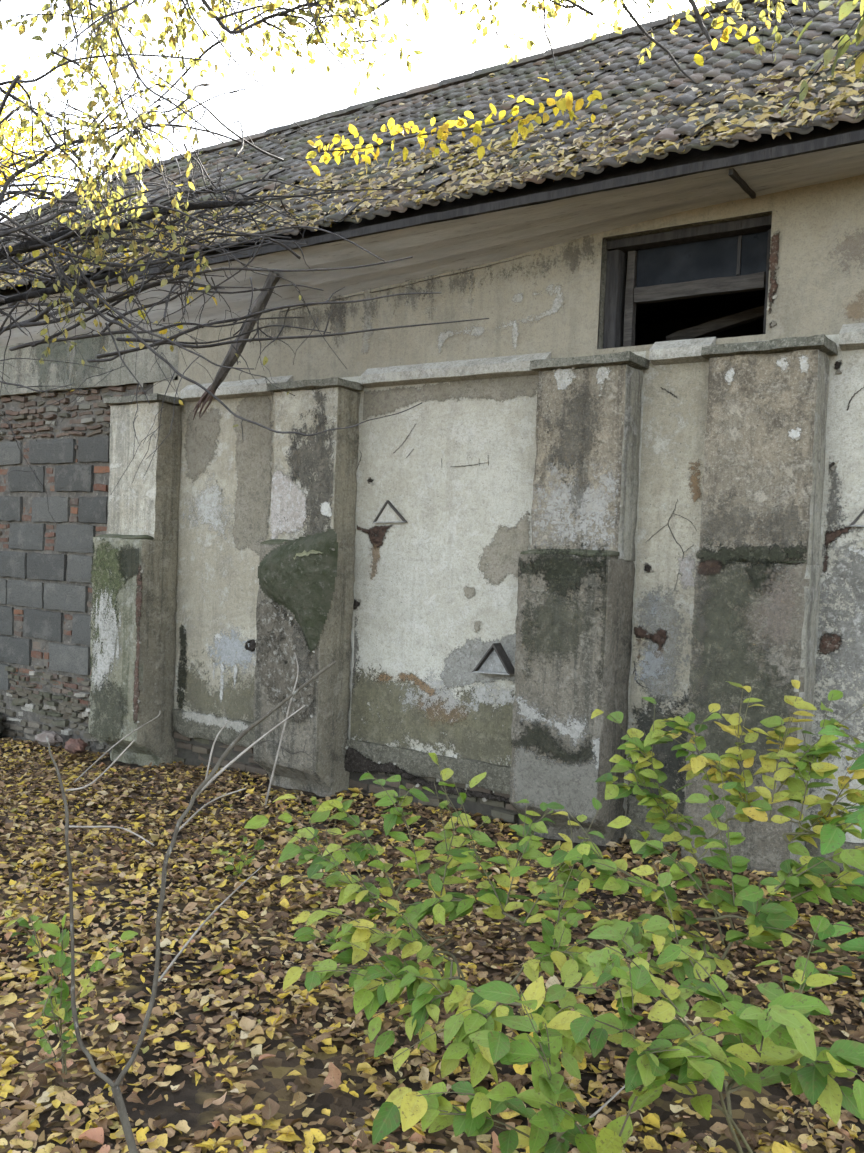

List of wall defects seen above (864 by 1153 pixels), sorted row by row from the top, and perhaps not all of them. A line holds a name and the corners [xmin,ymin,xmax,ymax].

leakage [286,387,335,537]
rust [357,524,393,579]
peeling [464,512,531,598]
crack [645,499,696,590]
peeling [440,620,516,689]
rust [634,627,668,672]